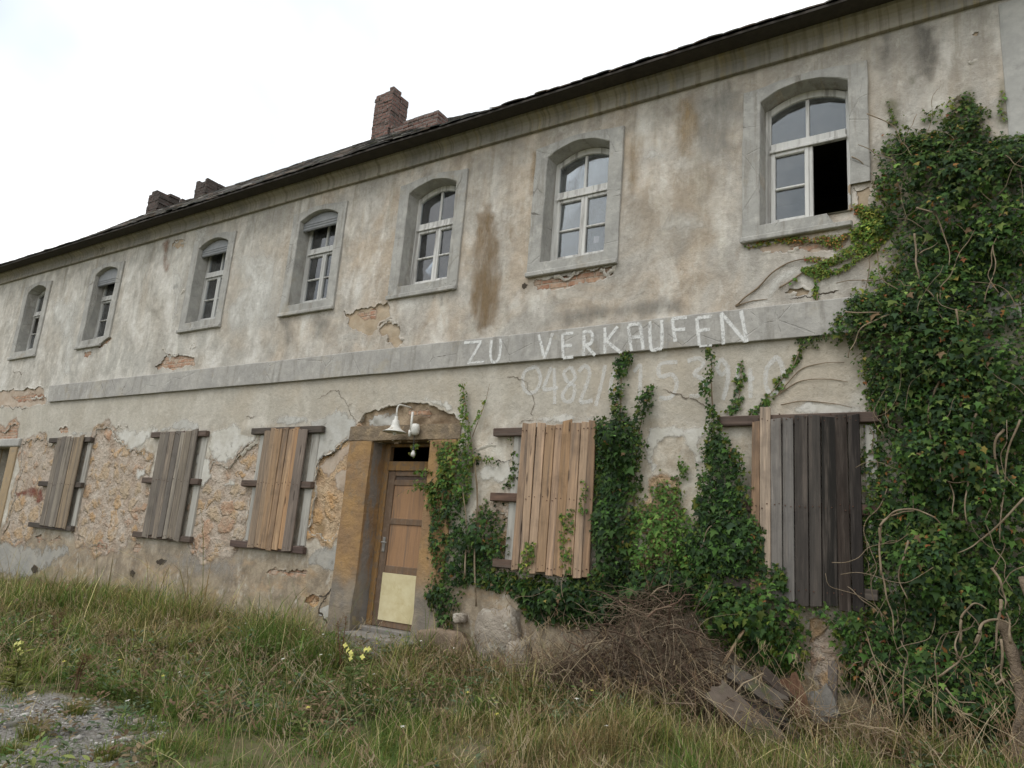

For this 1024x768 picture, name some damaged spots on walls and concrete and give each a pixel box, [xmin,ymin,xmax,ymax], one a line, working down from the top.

flaking render [532,264,619,292]
flaking render [154,342,196,372]
flaking render [343,300,405,348]
flaking render [0,385,69,547]
flaking render [72,419,154,559]
flaking render [187,435,261,565]
flaking render [306,438,350,548]
crack [314,390,356,480]
flaking render [355,400,464,440]